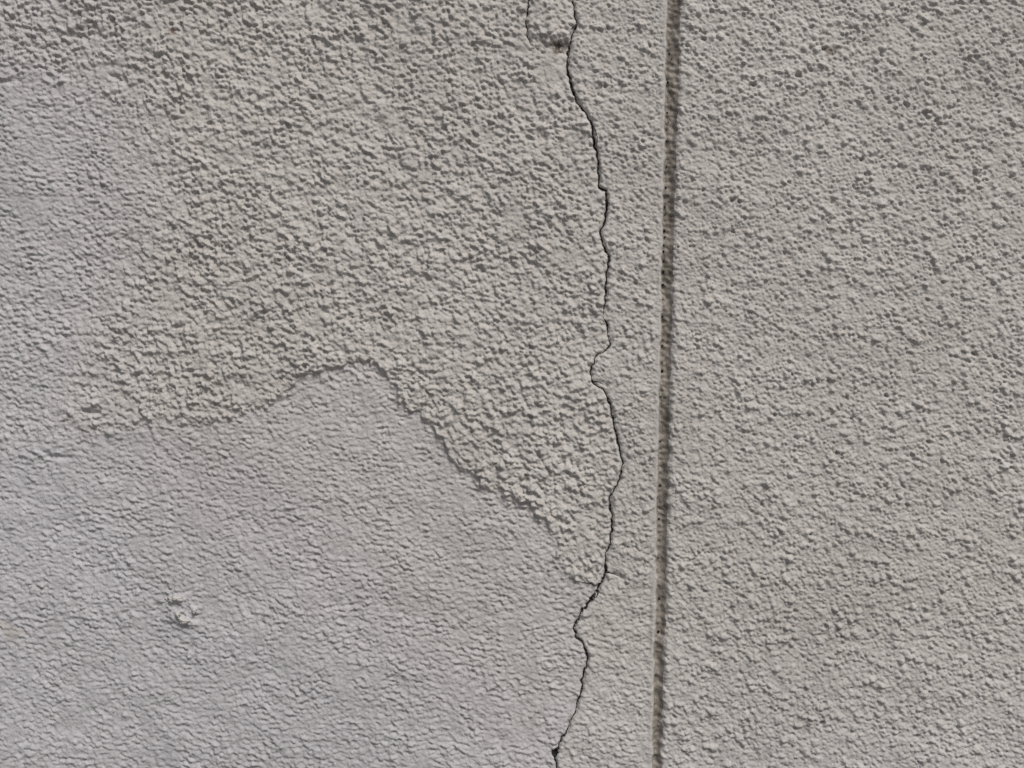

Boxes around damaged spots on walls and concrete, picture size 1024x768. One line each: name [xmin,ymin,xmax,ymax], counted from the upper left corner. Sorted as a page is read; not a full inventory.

flaking render [0,69,599,768]
crack [554,0,624,768]